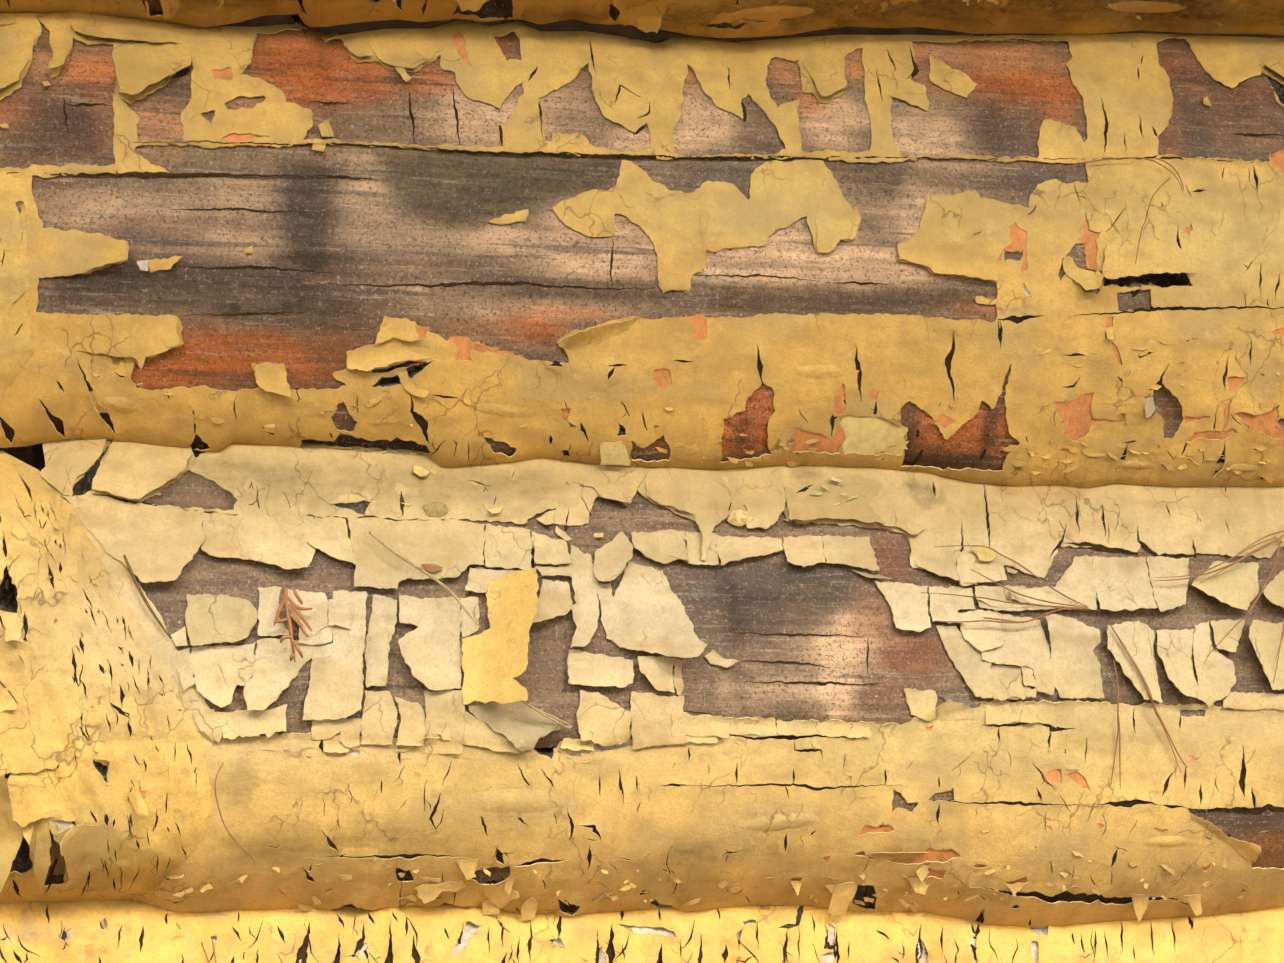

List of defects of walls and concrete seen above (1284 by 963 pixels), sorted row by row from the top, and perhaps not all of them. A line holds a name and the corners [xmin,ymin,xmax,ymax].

peeling [0,0,1088,436]
crack [6,41,1284,316]
peeling [1156,38,1284,173]
peeling [0,678,123,897]
crack [0,477,197,963]
crack [99,747,630,963]
peeling [388,859,538,921]
peeling [40,361,1284,763]
crack [733,632,887,686]
peeling [791,847,960,917]
crack [595,711,1284,963]
crack [1050,503,1229,559]